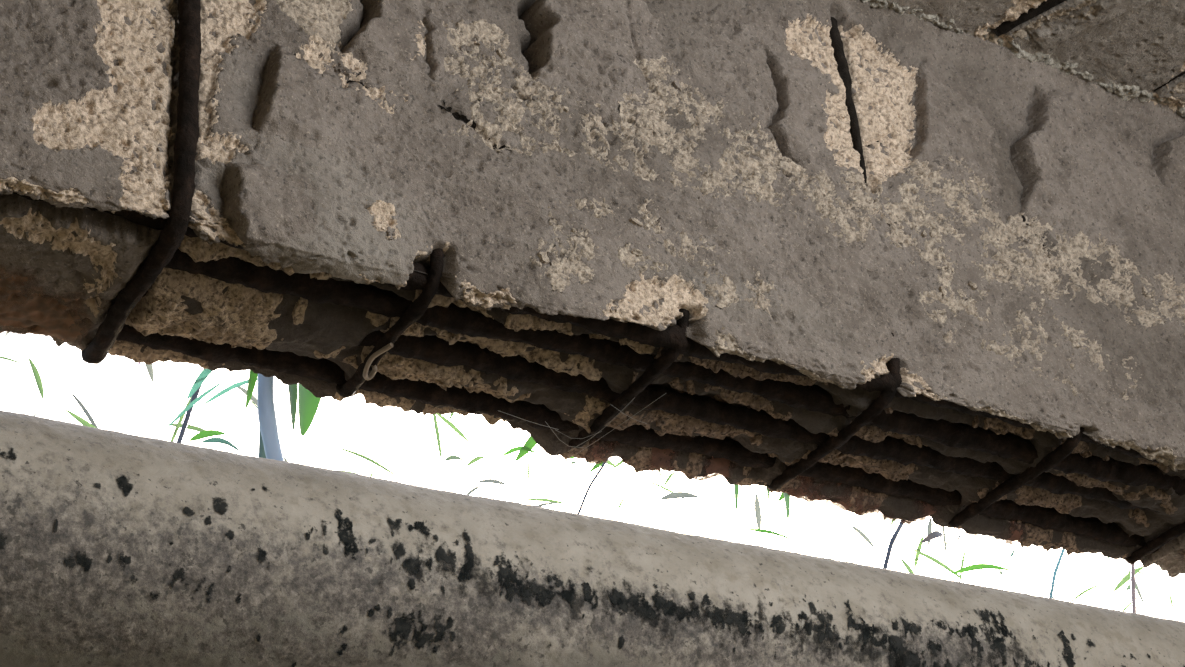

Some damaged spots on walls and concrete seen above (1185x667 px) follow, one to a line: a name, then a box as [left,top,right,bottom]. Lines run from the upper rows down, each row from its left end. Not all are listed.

spalling [31,0,175,217]
peeling [108,0,1185,403]
corrosion [0,265,93,342]
spalling [332,390,505,425]
leakage [116,474,139,496]
leakage [183,497,228,525]
leakage [306,509,376,560]
corrosion [646,447,735,487]
spalling [561,395,928,497]
corrosion [774,475,937,525]
corrosion [964,520,1025,545]
leakage [368,518,1096,667]